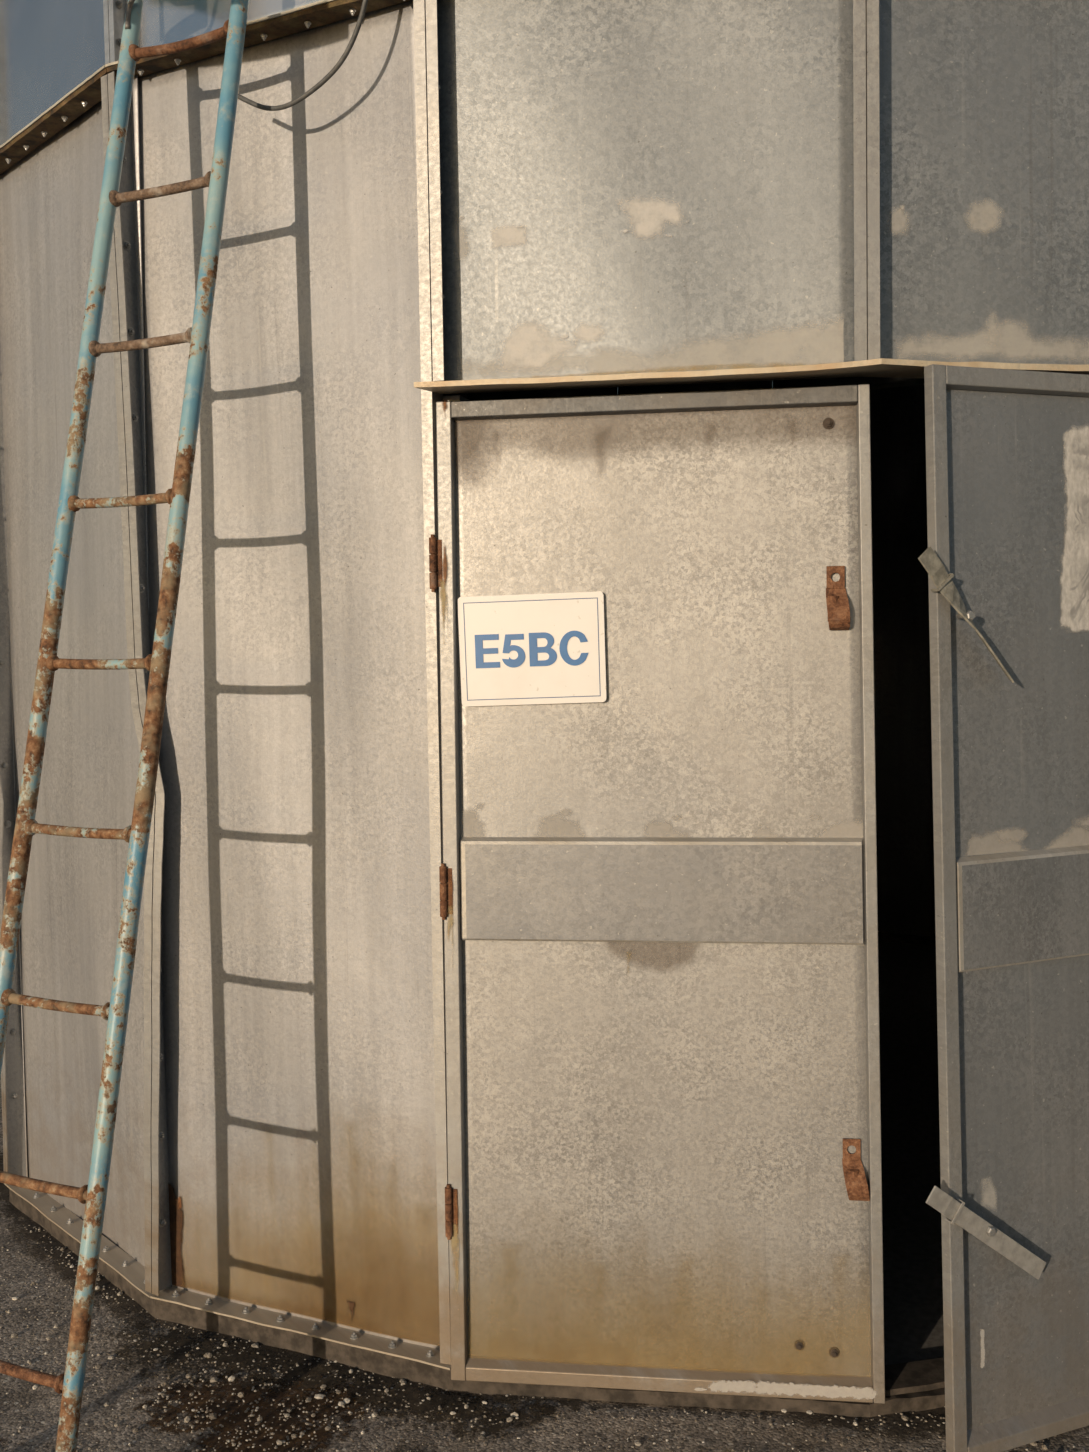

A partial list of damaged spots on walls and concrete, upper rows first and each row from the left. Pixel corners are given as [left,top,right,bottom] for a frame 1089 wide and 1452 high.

peeling [623,200,680,237]
peeling [503,323,571,367]
water stain [0,1151,79,1287]
corrosion [168,1183,185,1288]
water stain [242,1212,439,1344]
water stain [94,1272,946,1441]